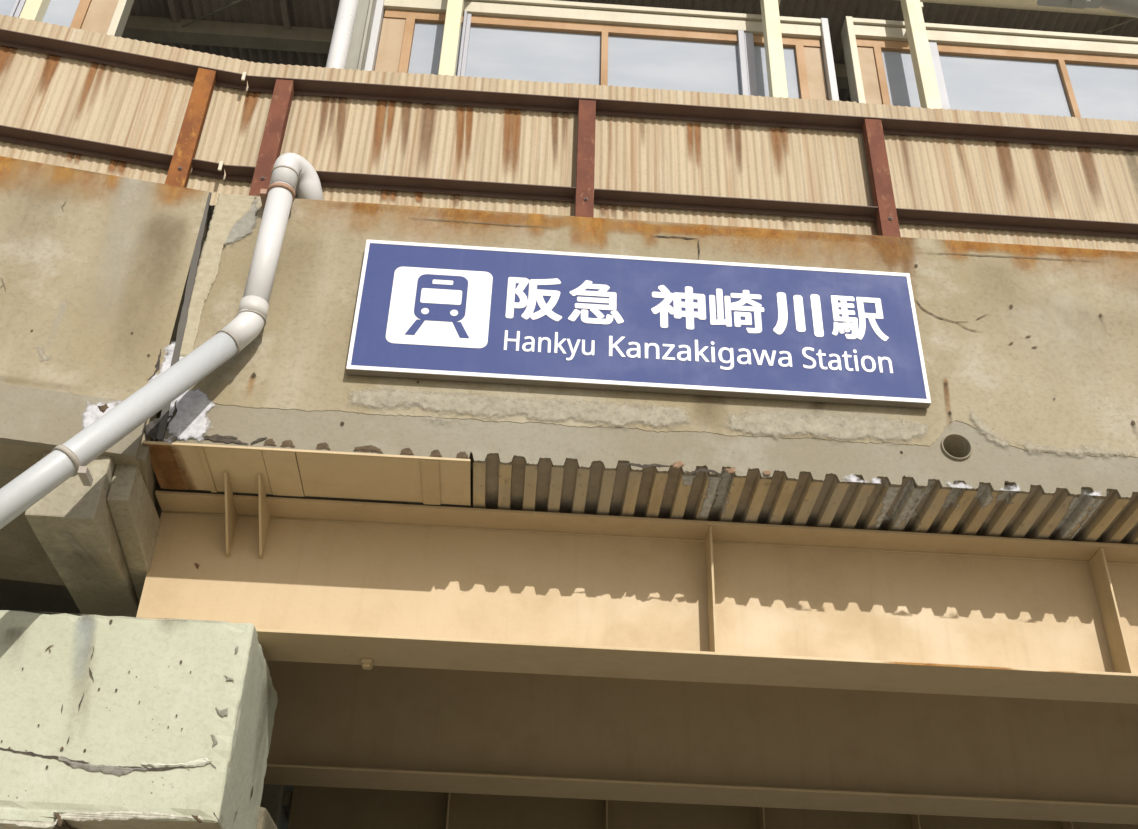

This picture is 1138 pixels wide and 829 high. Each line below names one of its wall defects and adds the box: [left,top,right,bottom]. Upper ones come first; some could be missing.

rust [242,91,260,126]
rust [321,96,347,144]
rust [375,100,436,156]
rust [457,106,473,157]
rust [503,108,521,164]
rust [996,141,1012,187]
rust [573,204,910,263]
rust [946,240,1138,262]
peeling [890,480,935,529]
peeling [974,484,1017,509]
crack [0,646,94,766]
crack [120,764,183,772]